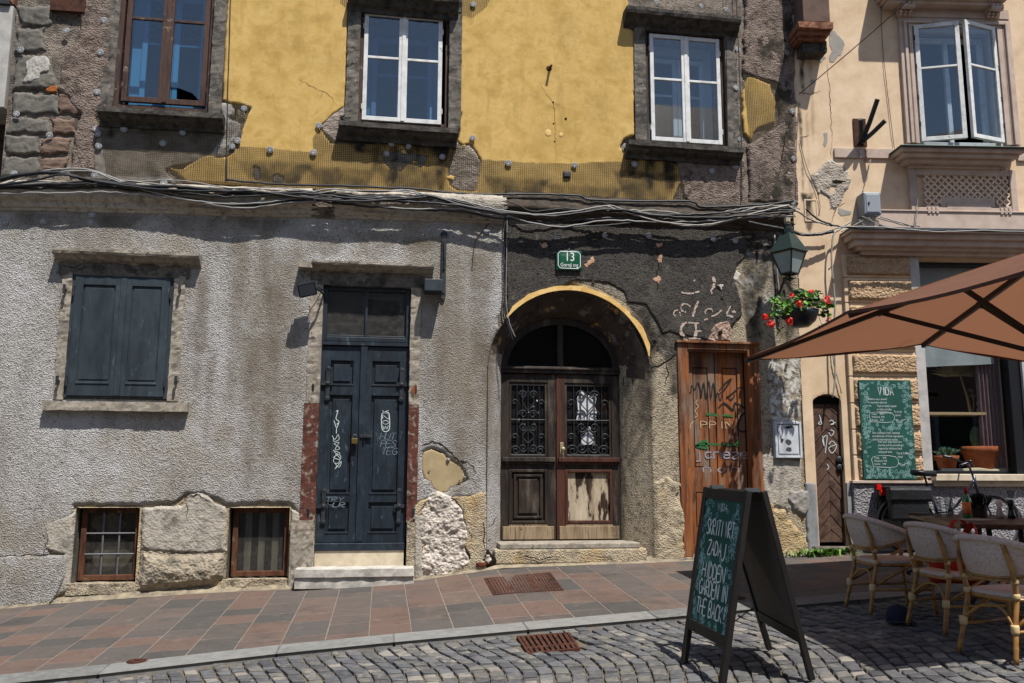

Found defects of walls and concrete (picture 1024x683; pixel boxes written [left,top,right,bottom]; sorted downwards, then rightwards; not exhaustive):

peeling [23,56,58,93]
flaking render [211,103,240,154]
flaking render [321,106,345,144]
flaking render [447,143,480,191]
flaking render [810,159,852,216]
flaking render [420,449,470,576]